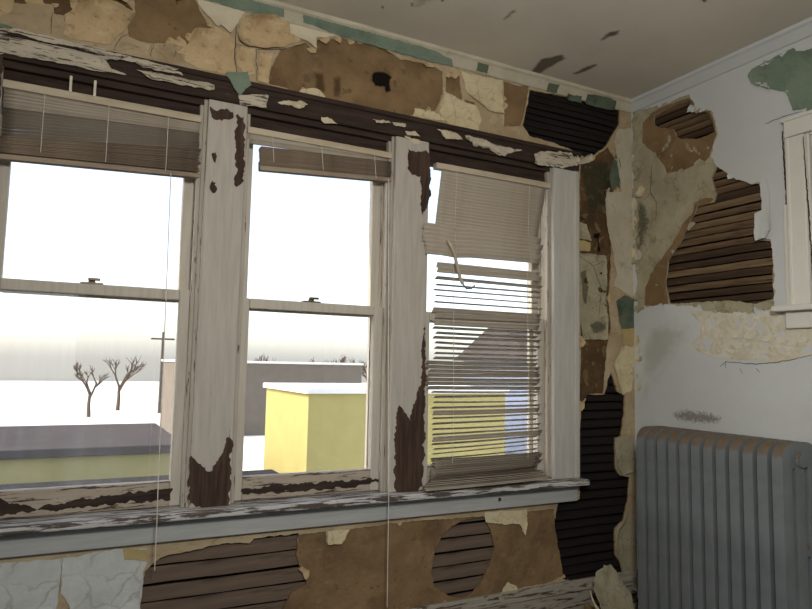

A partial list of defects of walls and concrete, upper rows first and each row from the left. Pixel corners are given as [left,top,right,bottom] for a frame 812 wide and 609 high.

spalling [14,0,78,15]
spalling [113,0,246,47]
peeling [0,28,215,90]
spalling [210,23,474,215]
spalling [140,82,812,609]
peeling [0,488,173,516]